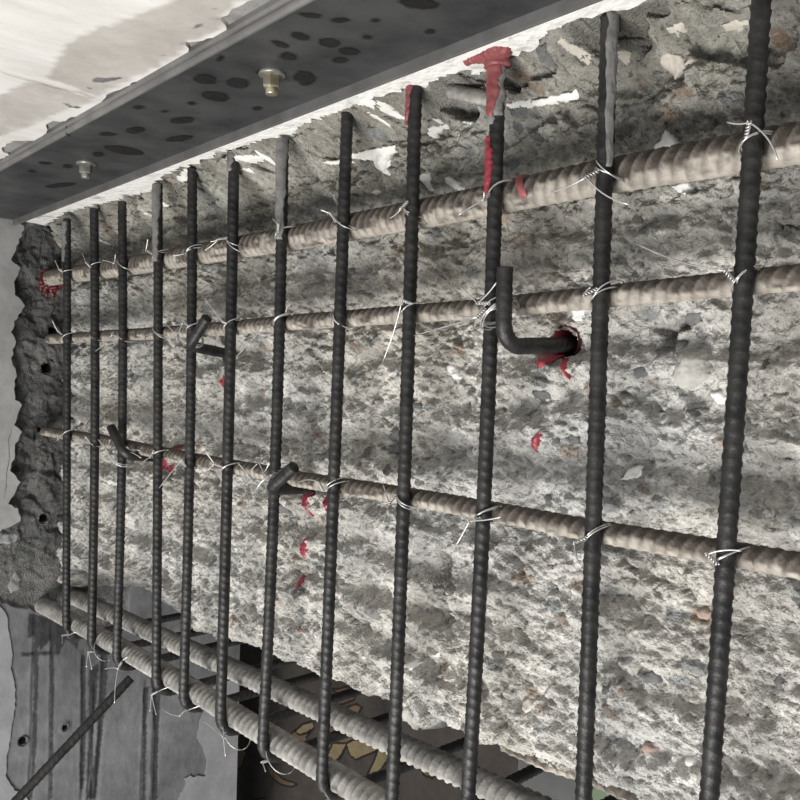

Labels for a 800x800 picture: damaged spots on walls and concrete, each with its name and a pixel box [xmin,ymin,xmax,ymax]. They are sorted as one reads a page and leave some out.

spalling [614,2,698,81]
spalling [423,70,487,139]
flaking render [352,144,398,176]
spalling [613,114,743,195]
spalling [0,223,225,717]
spalling [601,521,717,563]
spalling [735,542,800,580]
leakage [21,614,78,775]
leakage [80,655,107,799]
leakage [141,678,160,800]
spalling [268,722,317,781]
spalling [400,705,463,788]